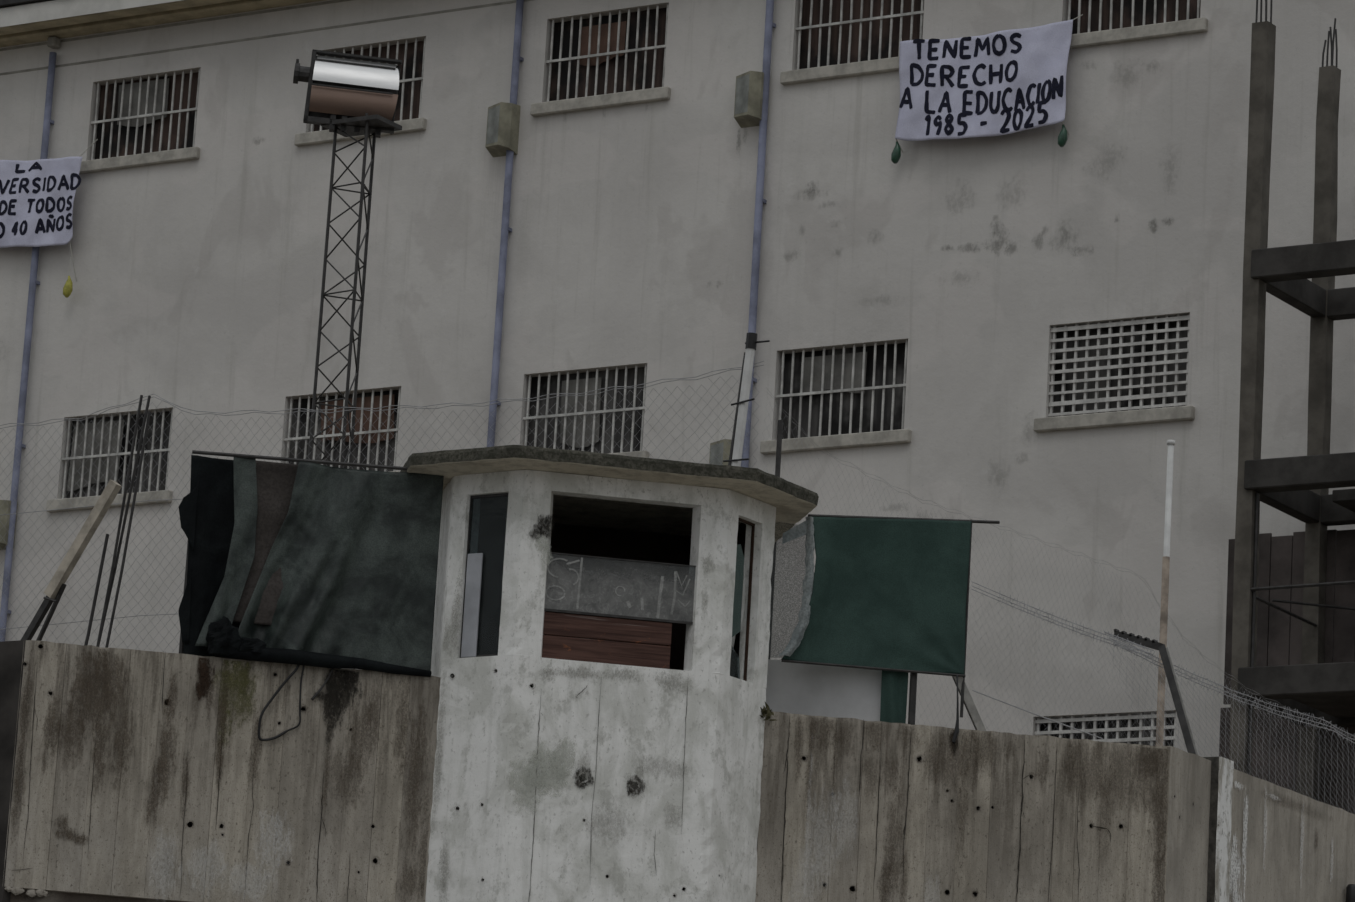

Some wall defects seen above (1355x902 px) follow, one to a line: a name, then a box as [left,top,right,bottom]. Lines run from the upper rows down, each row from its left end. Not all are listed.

damp [43,651,133,786]
damp [147,675,189,822]
damp [207,672,261,786]
damp [315,669,345,744]
spalling [574,767,594,788]
spalling [627,775,645,796]
damp [1230,781,1248,902]